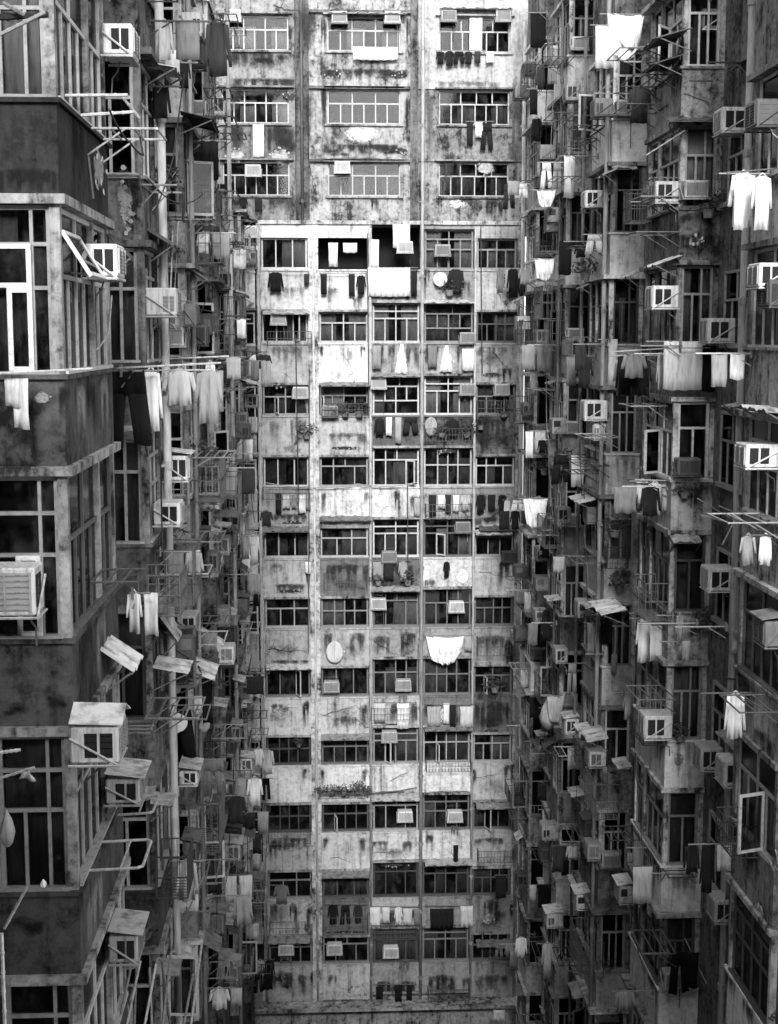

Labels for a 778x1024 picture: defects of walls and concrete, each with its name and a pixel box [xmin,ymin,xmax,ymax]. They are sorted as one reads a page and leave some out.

water stain [232,49,284,64]
water stain [327,69,406,79]
water stain [234,78,294,95]
water stain [327,564,412,589]
water stain [350,633,415,655]
water stain [270,838,306,855]
water stain [272,973,313,992]
water stain [429,975,507,995]